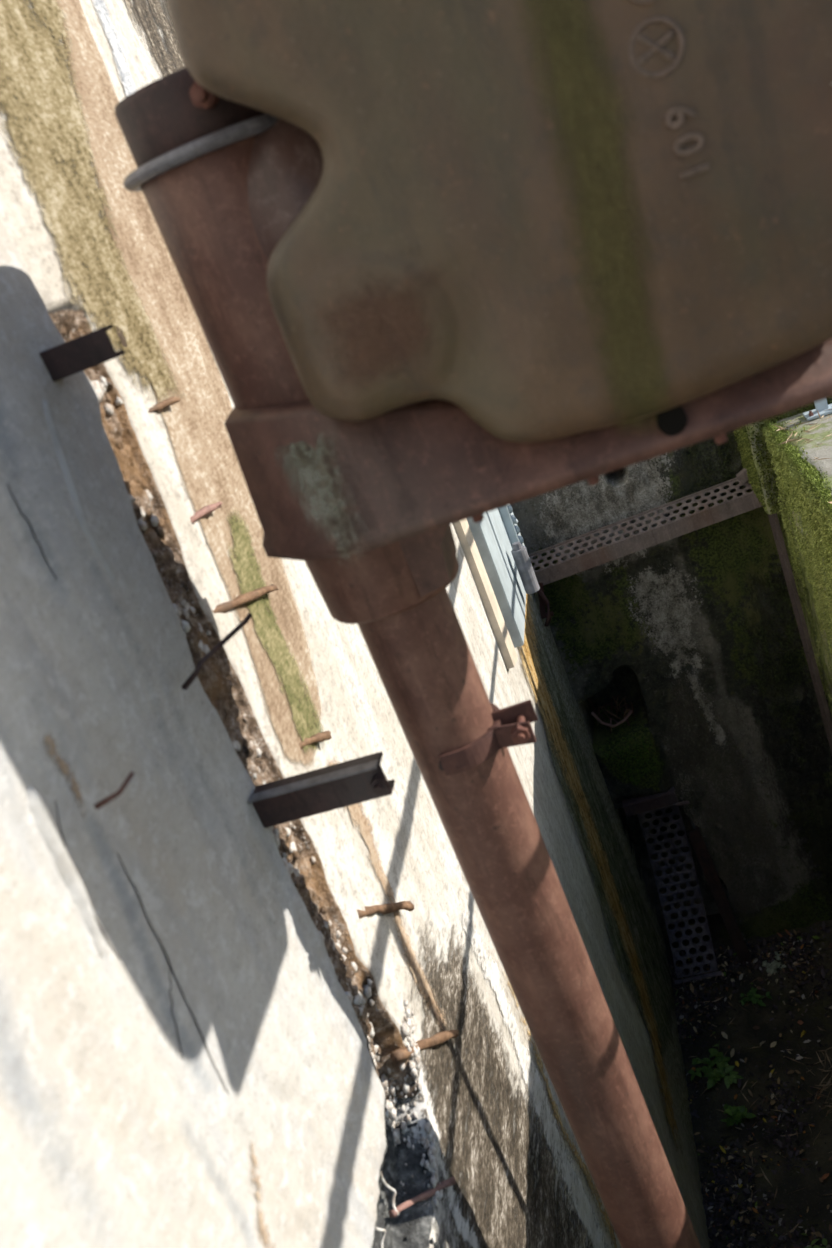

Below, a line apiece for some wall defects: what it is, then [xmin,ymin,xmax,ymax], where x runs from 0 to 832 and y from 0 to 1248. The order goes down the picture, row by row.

rust [55,0,340,766]
leakage [534,430,752,561]
crack [55,800,66,847]
crack [94,915,121,959]
crack [117,852,229,1095]
rust [348,802,445,1028]
leakage [388,910,609,1248]
leakage [593,549,832,924]